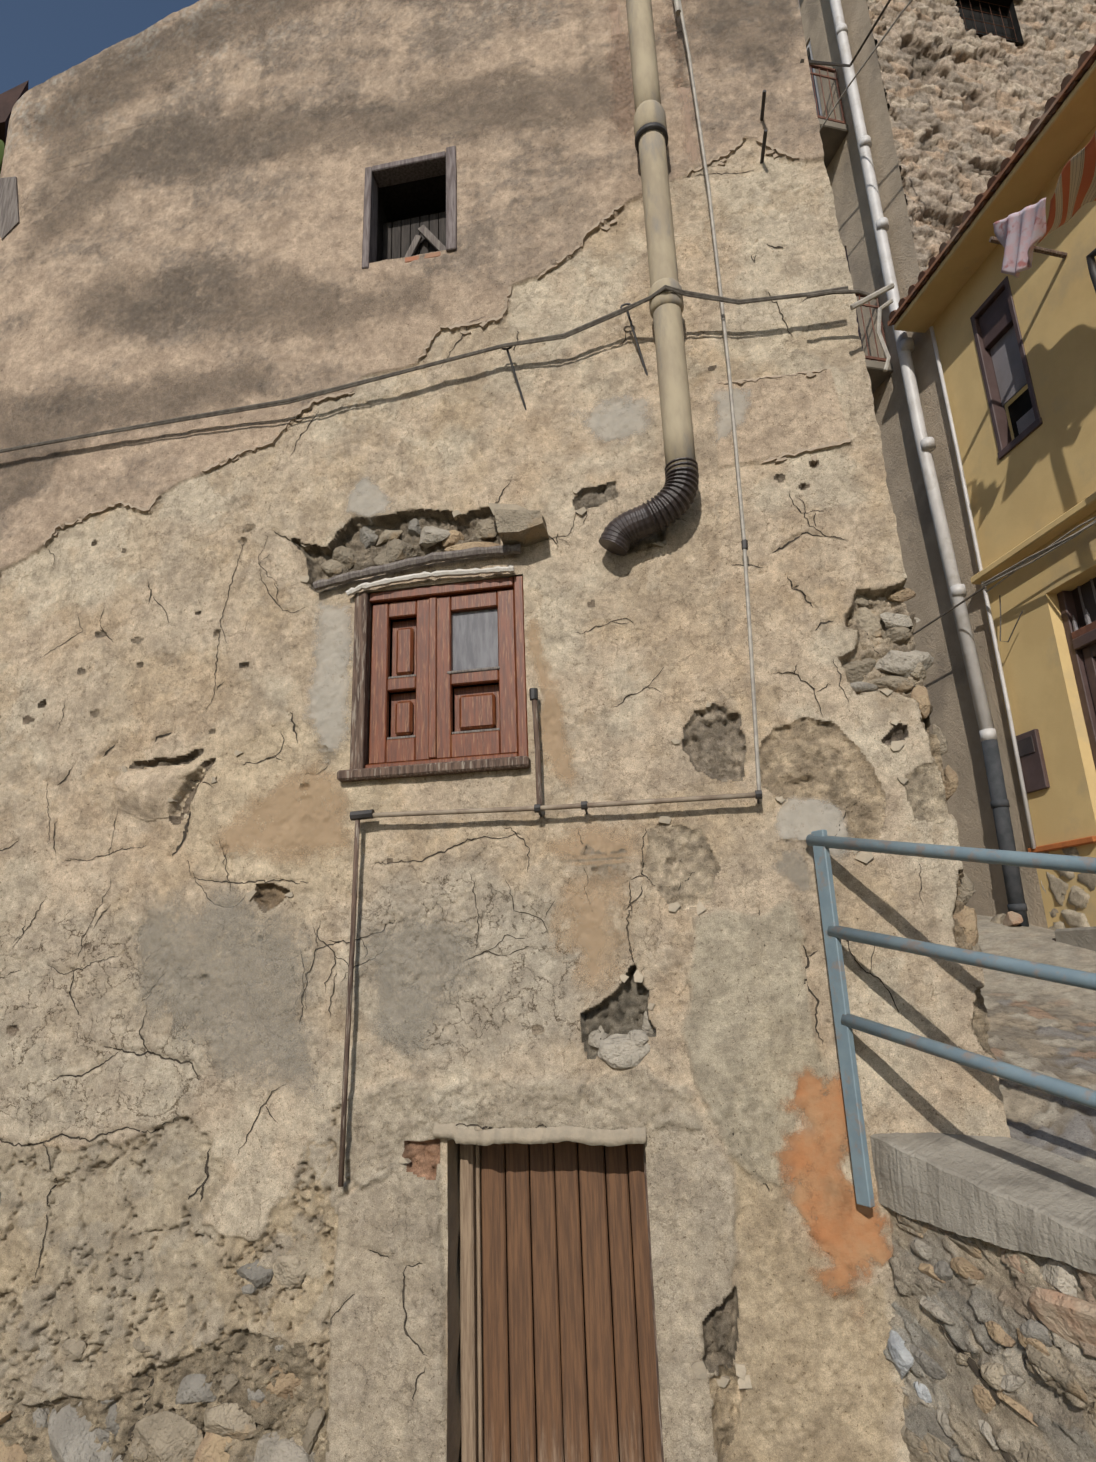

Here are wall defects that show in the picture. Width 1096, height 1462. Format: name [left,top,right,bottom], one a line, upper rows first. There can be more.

spalling [291,507,500,593]
spalling [572,481,618,517]
spalling [671,578,959,864]
crack [0,745,307,1015]
crack [51,972,201,1081]
crack [299,919,397,1024]
spalling [580,965,656,1070]
crack [0,1117,178,1279]
crack [188,1085,283,1202]
corrosion [778,1071,893,1296]
spalling [0,1314,329,1462]
spalling [691,1287,752,1462]